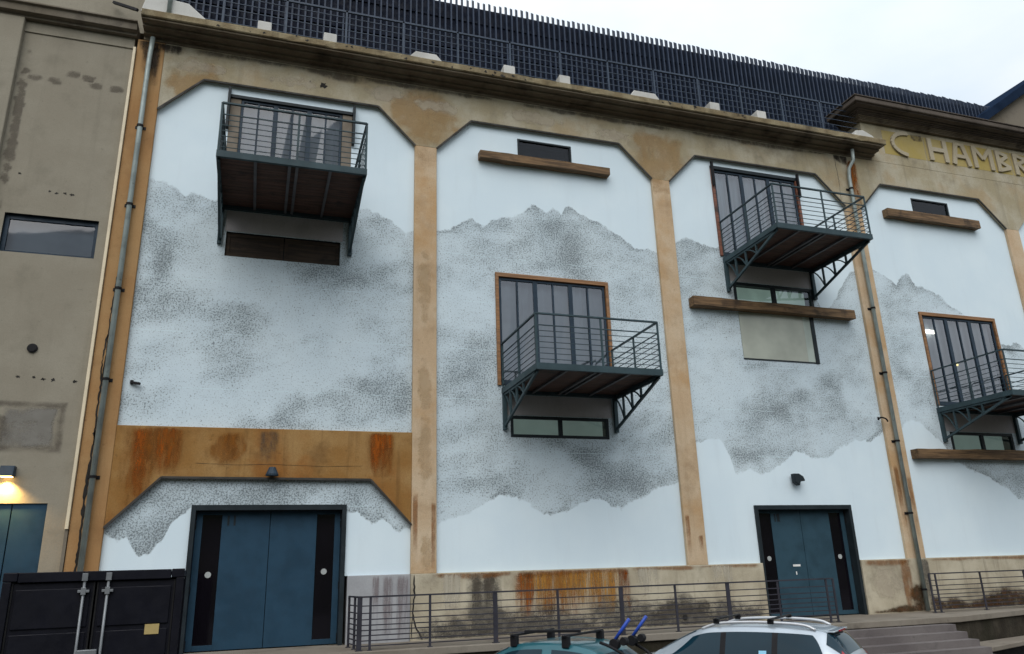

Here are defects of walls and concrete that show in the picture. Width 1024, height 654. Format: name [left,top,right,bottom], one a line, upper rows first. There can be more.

corrosion [132,428,179,491]
corrosion [371,434,392,466]
crack [411,576,422,640]
corrosion [517,569,630,614]